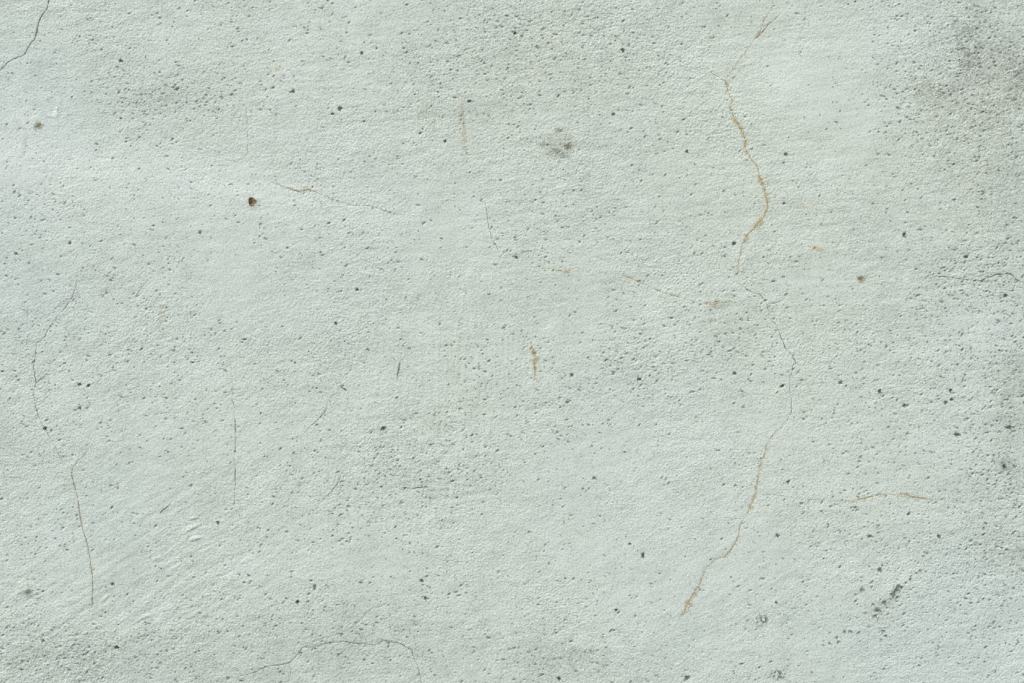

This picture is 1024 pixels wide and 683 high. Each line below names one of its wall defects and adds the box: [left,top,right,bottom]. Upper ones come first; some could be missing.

crack [733,118,768,241]